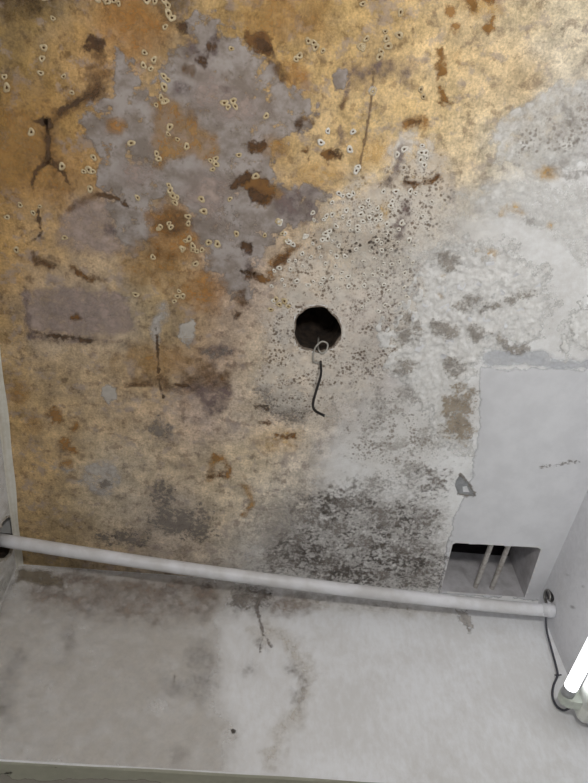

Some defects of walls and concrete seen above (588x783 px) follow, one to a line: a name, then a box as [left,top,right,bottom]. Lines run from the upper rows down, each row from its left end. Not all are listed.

rust [244,31,285,83]
peeling [332,60,392,93]
rust [435,47,448,104]
crack [31,90,99,189]
peeling [61,10,332,303]
rust [230,170,278,205]
crack [358,71,376,173]
rust [240,241,301,284]
damp [0,0,588,589]
crack [137,328,189,399]
flaking render [455,473,476,497]
damp [0,550,309,770]